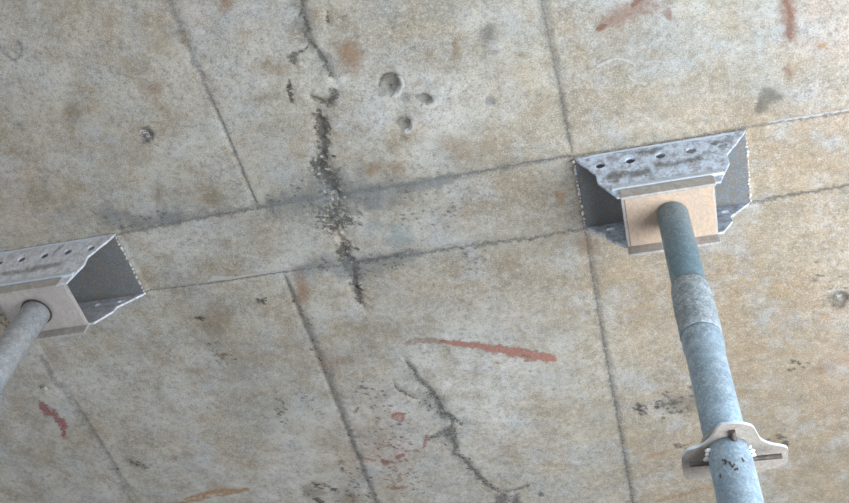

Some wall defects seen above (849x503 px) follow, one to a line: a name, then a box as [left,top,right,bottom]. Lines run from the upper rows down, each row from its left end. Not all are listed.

rust [782,0,796,39]
spalling [417,95,438,108]
spalling [397,117,414,133]
crack [286,0,364,302]
rust [408,339,556,372]
rust [40,403,67,438]
crack [395,362,529,492]